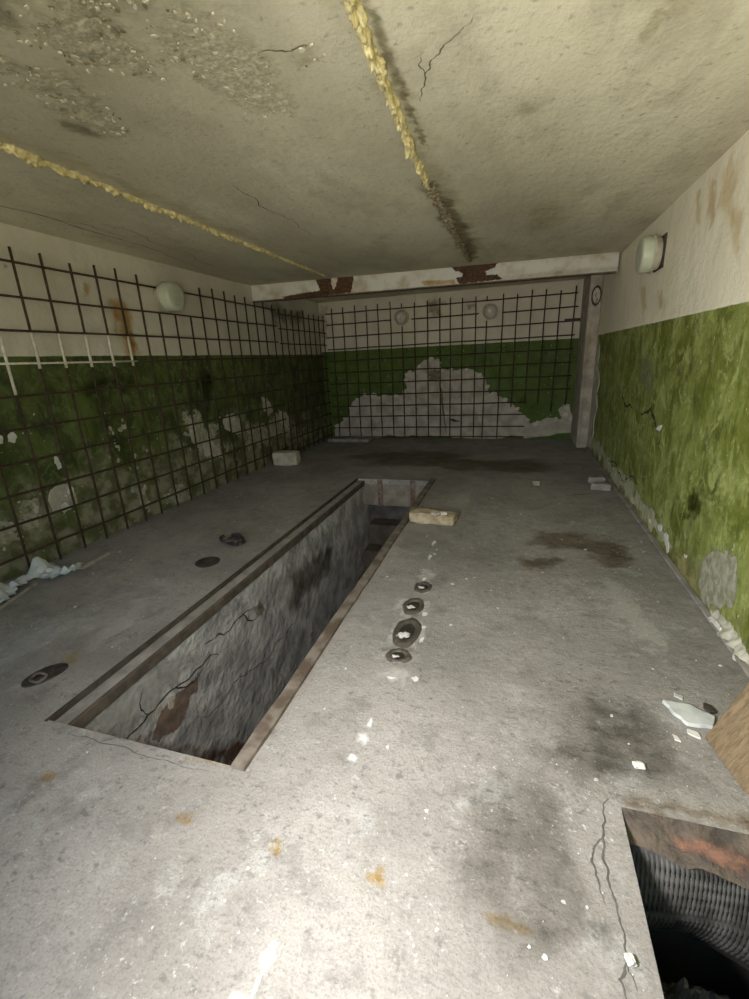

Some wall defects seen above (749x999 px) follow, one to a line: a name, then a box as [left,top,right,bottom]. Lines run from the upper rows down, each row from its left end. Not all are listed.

spalling [0,57,127,139]
spalling [14,0,288,120]
crack [418,17,473,101]
corrosion [282,276,354,300]
corrosion [452,263,502,284]
spalling [0,246,579,569]
peeling [698,549,741,610]
crack [68,609,257,772]
crack [203,617,302,718]
crack [590,798,637,999]